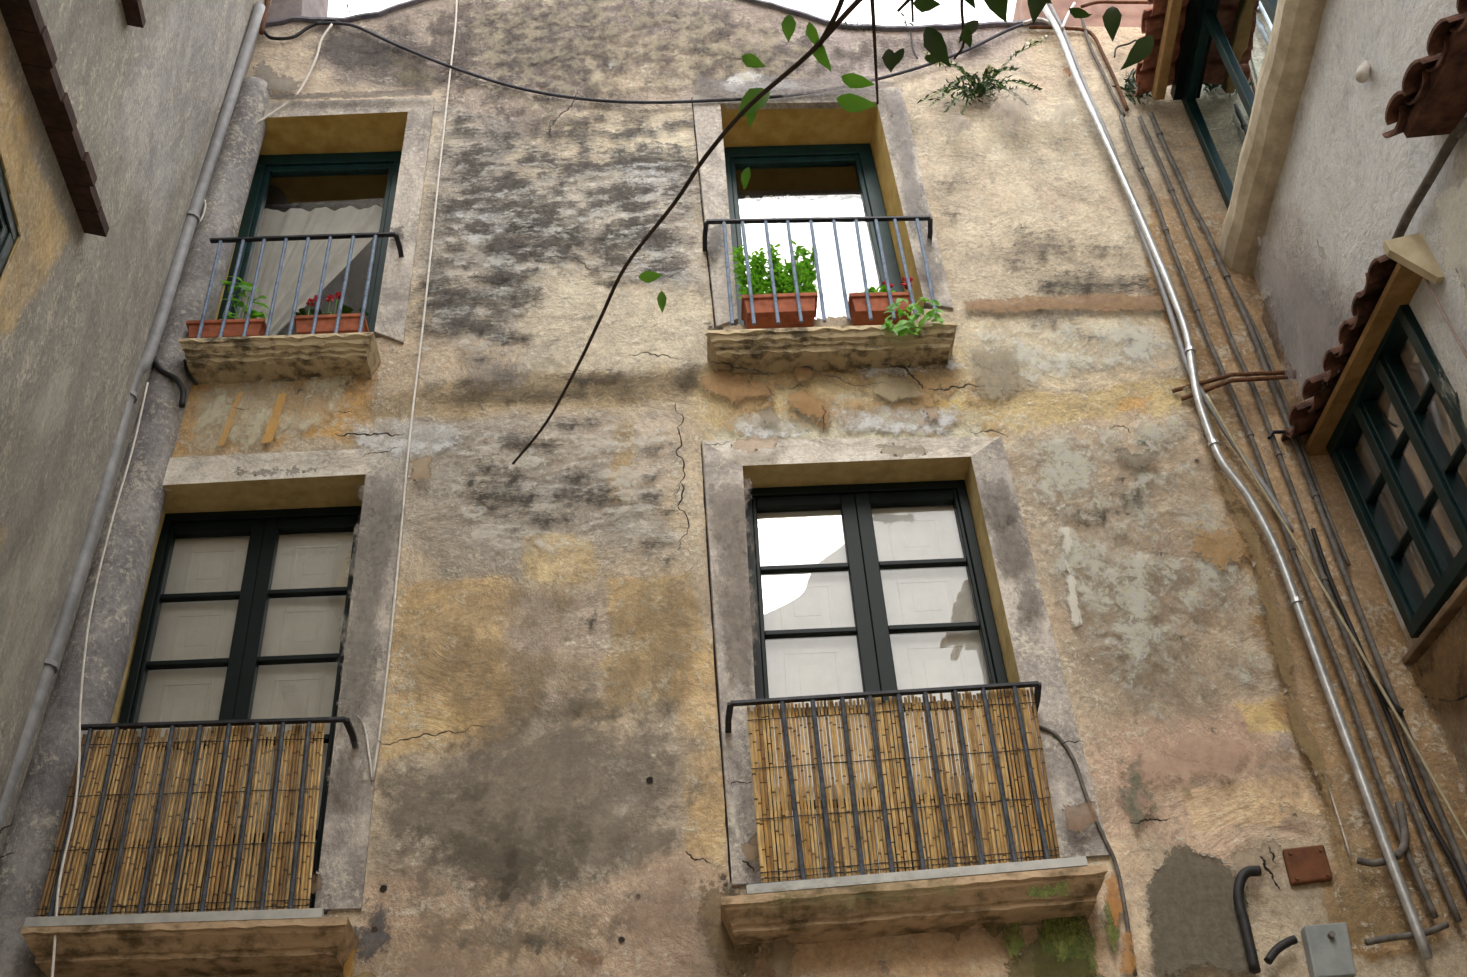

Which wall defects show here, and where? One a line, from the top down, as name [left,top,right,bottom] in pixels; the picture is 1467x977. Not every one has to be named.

damp [720,70,790,86]
damp [270,88,702,404]
damp [466,417,621,528]
damp [641,475,676,516]
peeling [700,357,1000,458]
damp [327,474,403,802]
crack [673,403,754,882]
peeling [1025,385,1342,834]
crack [377,725,489,745]
damp [380,769,626,917]